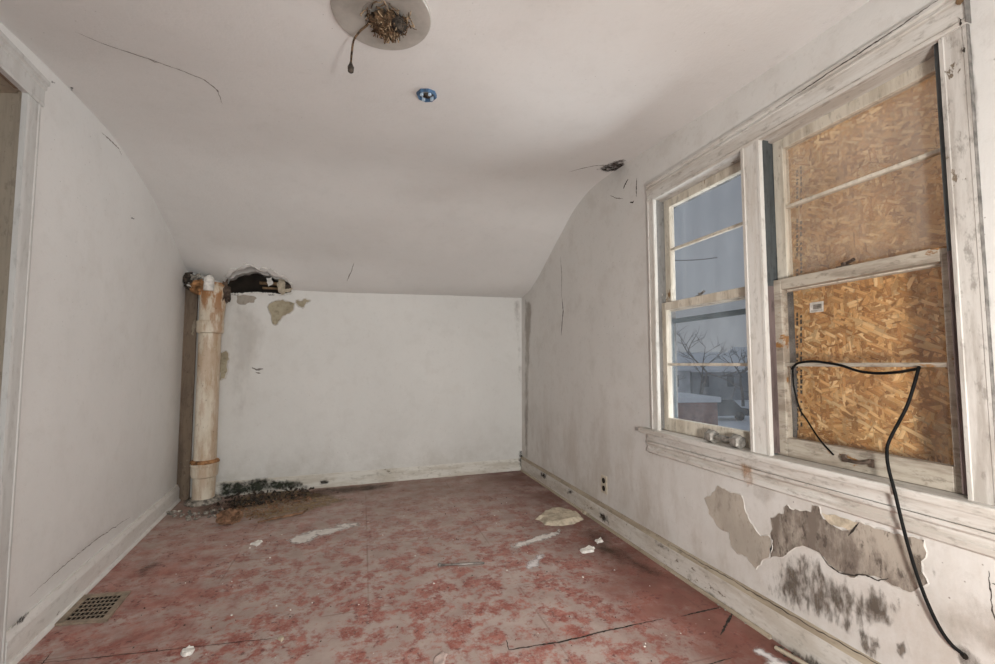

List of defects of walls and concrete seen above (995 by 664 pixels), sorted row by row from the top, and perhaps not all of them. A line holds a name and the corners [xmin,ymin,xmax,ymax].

crack [81,34,222,103]
spalling [221,263,311,326]
flaking render [704,485,930,594]
leakage [781,558,889,631]
leakage [860,632,878,656]